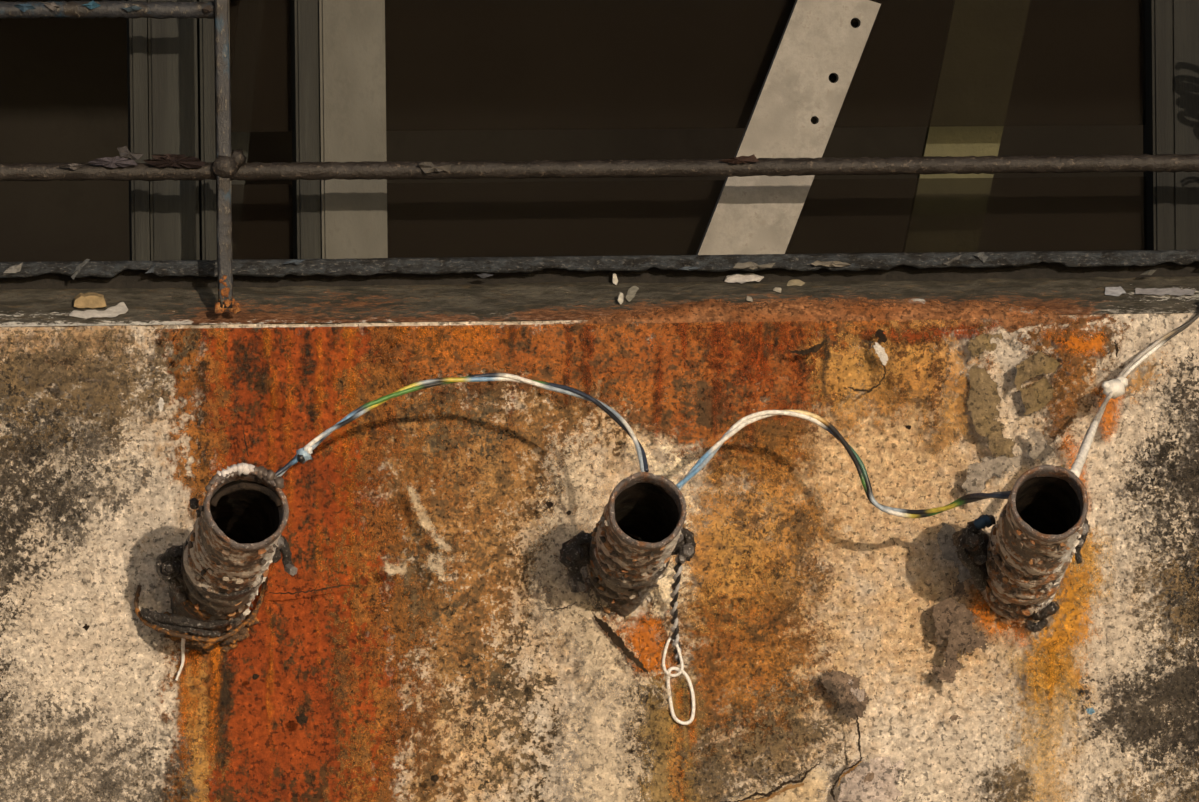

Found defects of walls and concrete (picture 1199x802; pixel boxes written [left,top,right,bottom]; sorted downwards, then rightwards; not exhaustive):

corrosion [1017,318,1169,487]
corrosion [155,320,1000,802]
corrosion [971,529,1101,710]
leakage [1071,352,1199,802]
crack [720,716,863,802]